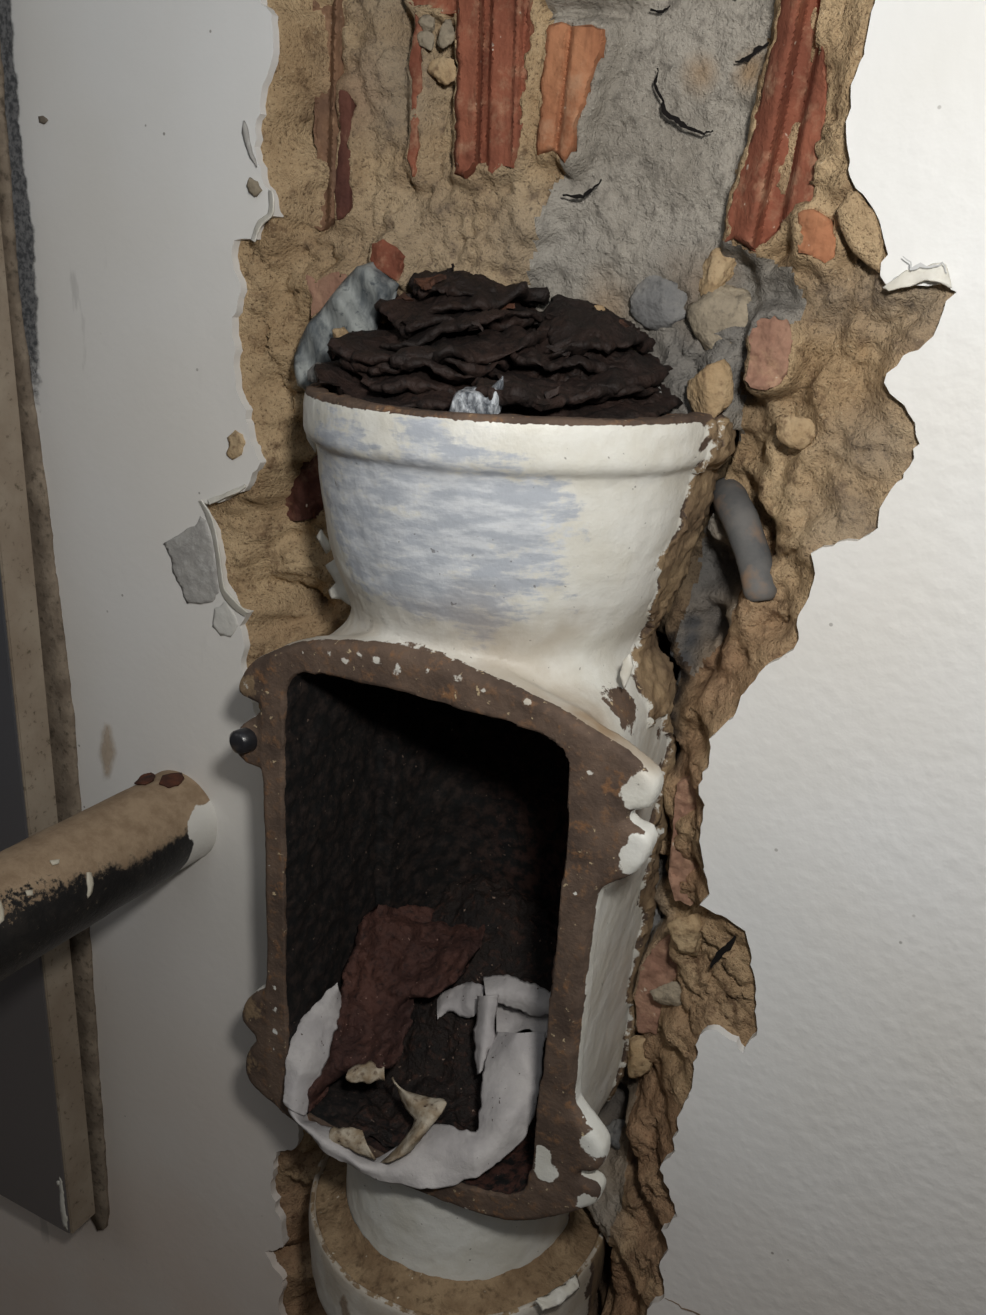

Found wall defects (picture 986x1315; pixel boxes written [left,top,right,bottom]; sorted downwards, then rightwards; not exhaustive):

peeling [163,500,248,637]
flaking render [207,0,956,1315]
flaking render [134,772,184,788]